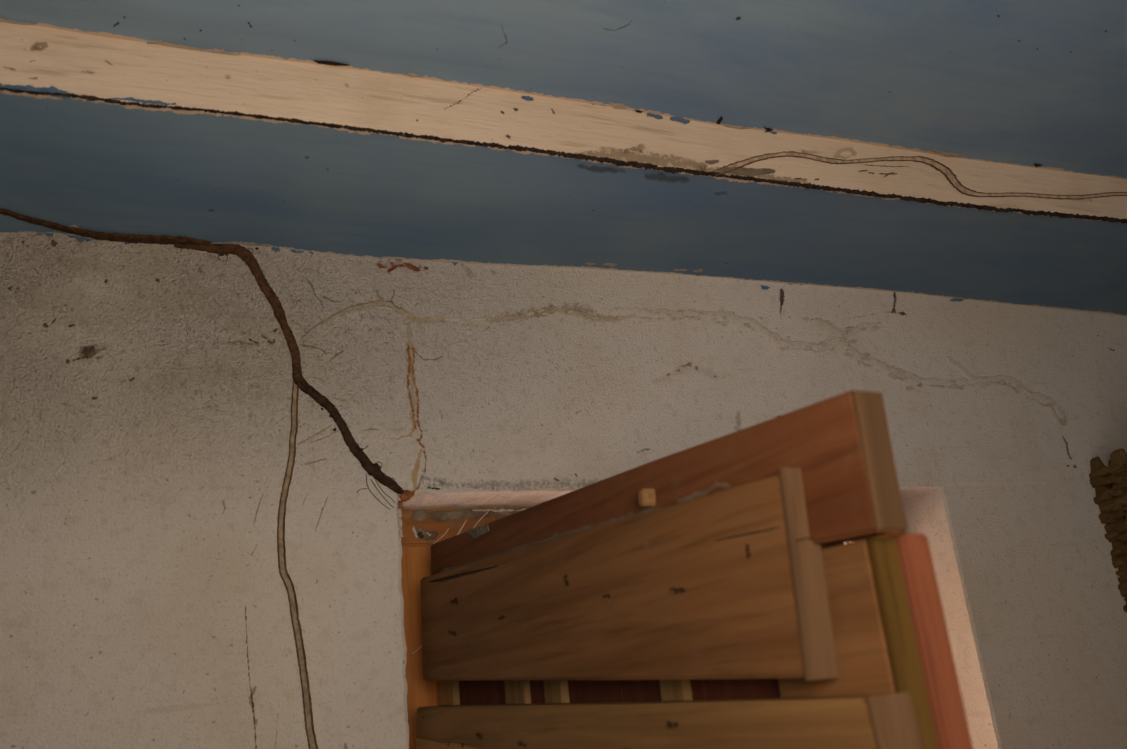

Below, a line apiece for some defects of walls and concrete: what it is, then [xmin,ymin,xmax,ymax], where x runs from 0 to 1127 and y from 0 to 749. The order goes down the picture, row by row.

crack [0,87,1127,224]
crack [0,208,405,749]